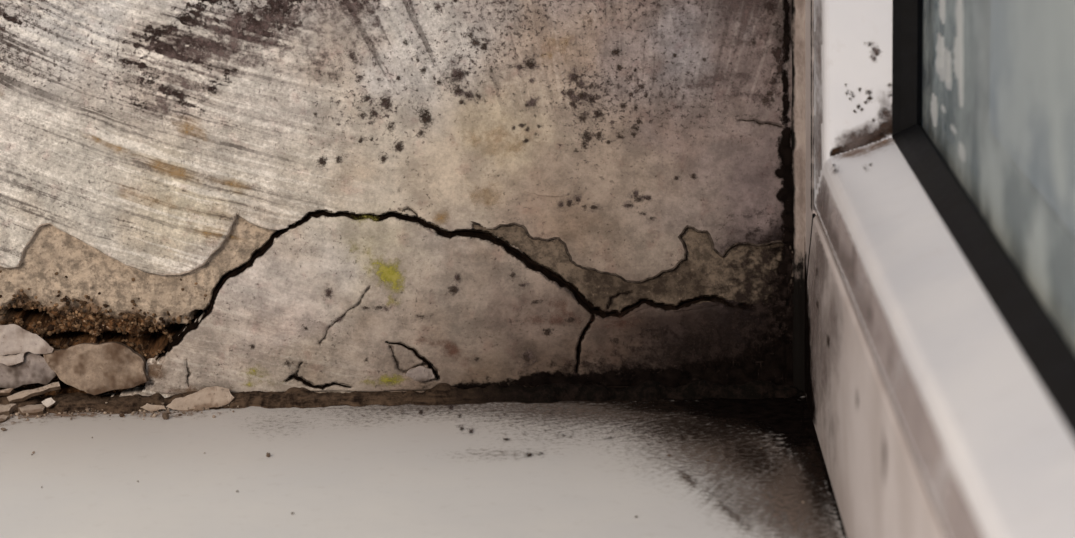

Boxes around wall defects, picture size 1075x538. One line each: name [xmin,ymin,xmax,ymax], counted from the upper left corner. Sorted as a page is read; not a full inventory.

damp [0,0,750,167]
damp [153,161,187,178]
spalling [0,210,289,365]
crack [155,208,765,389]
peeling [471,221,793,311]
damp [452,0,838,538]
spalling [0,376,86,397]
flaking render [140,403,167,411]